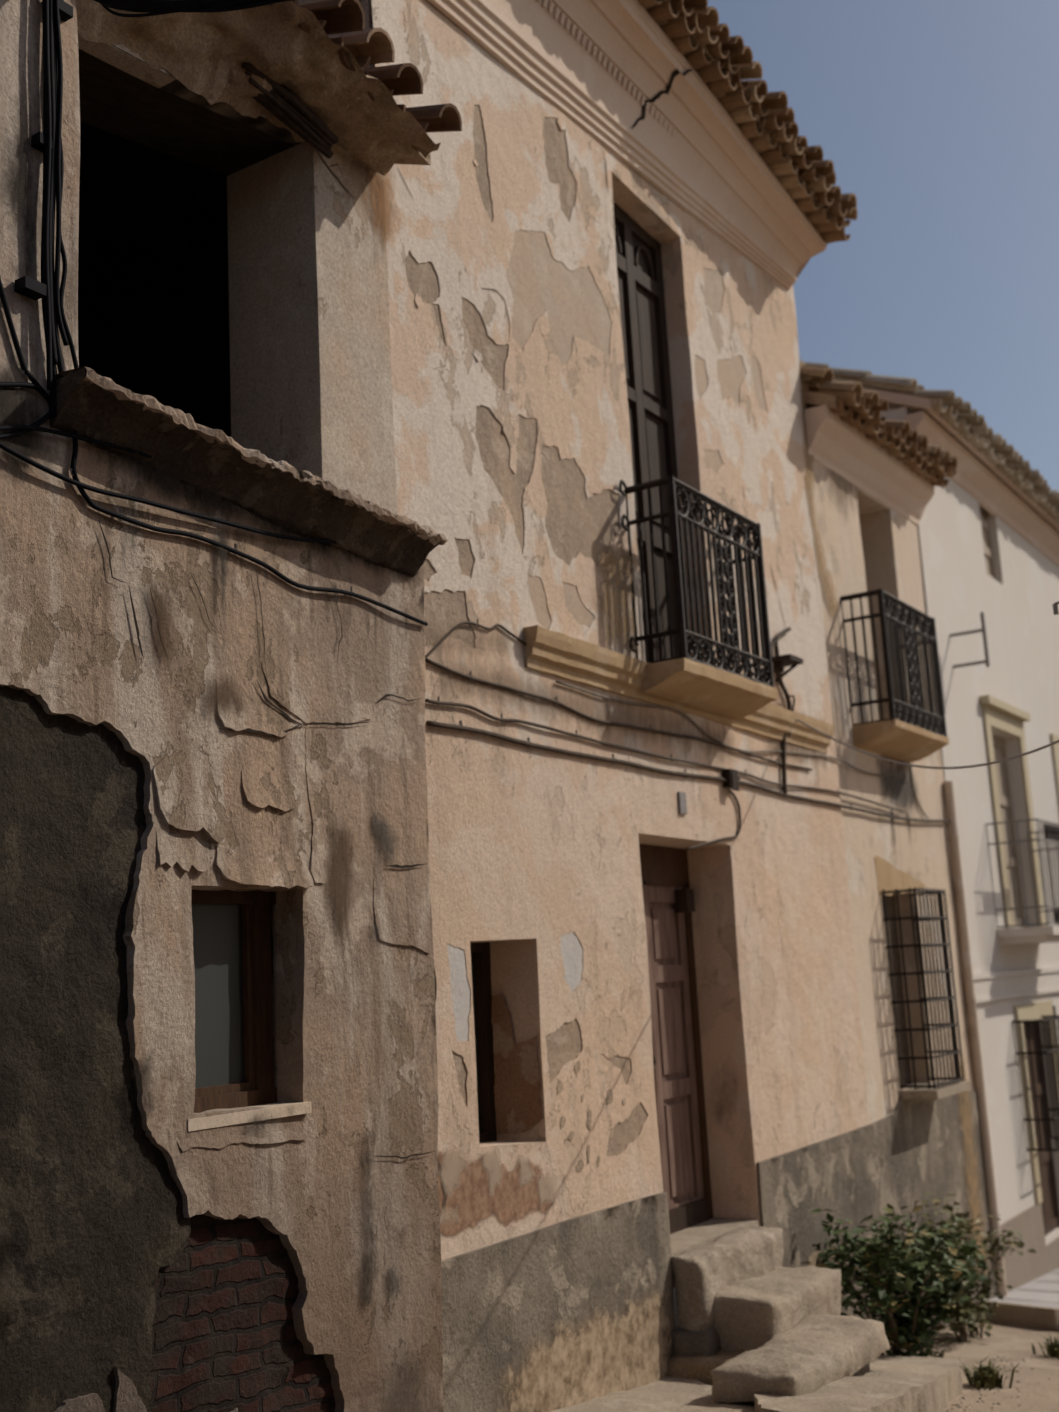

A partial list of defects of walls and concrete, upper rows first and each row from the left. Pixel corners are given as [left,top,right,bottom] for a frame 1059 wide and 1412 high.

crack [631,69,693,129]
peeling [473,105,493,222]
peeling [543,117,576,221]
peeling [405,252,445,344]
peeling [462,230,611,390]
peeling [717,355,767,412]
peeling [475,405,619,566]
peeling [424,538,475,648]
peeling [447,943,471,1106]
spalling [438,994,582,1236]
peeling [560,1054,647,1172]
flaking render [150,1214,336,1412]